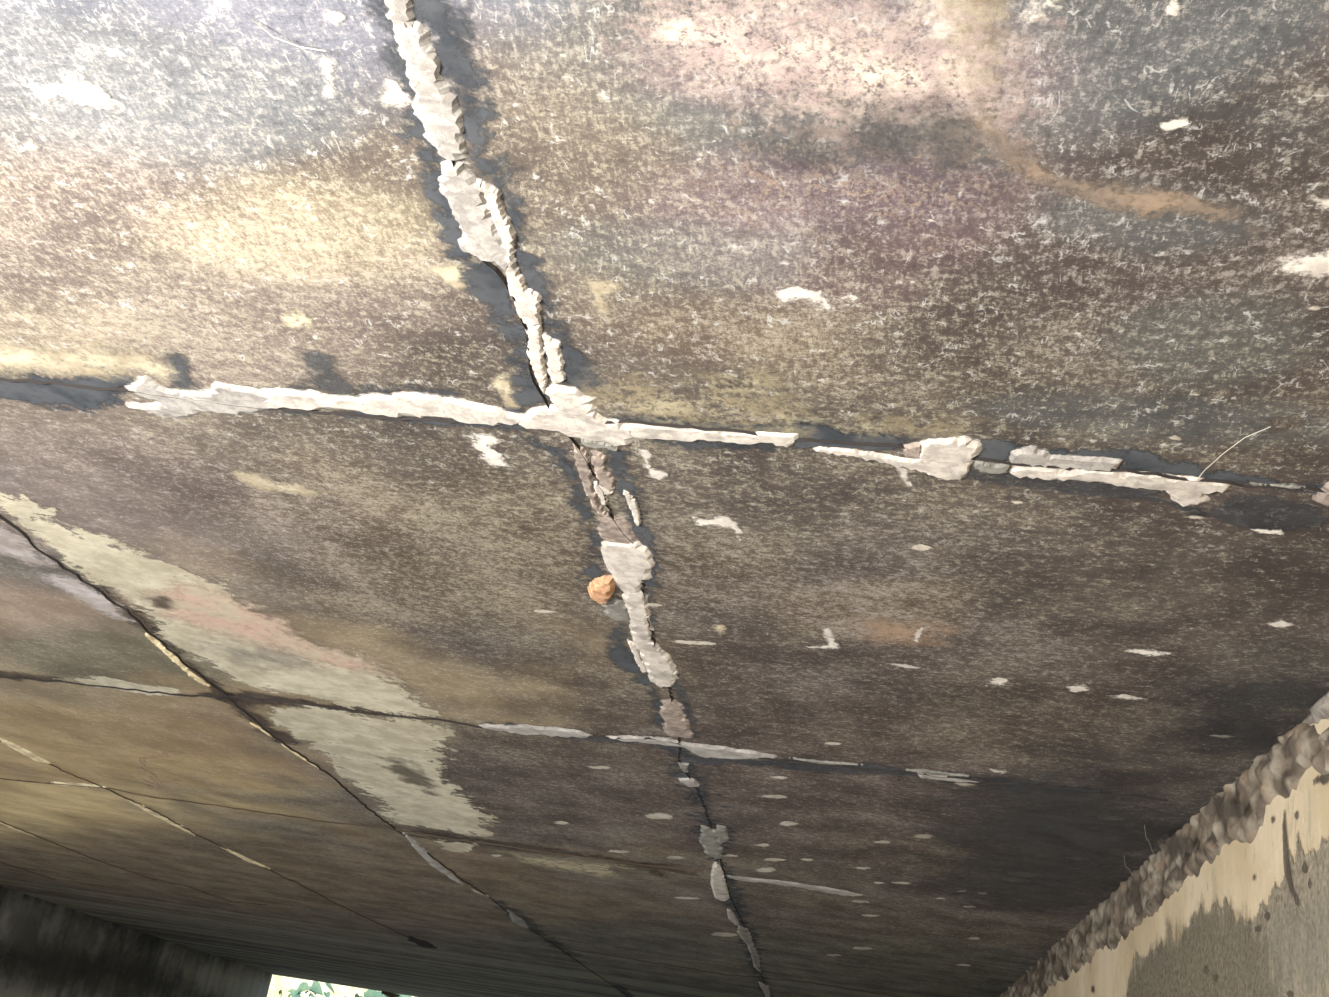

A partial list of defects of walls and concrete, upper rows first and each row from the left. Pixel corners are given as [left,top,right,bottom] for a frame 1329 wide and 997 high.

crack [0,0,1325,744]
leakage [0,886,233,997]
peeling [0,491,501,853]
peeling [503,851,638,878]
crack [0,515,1168,997]
peeling [1000,692,1329,997]